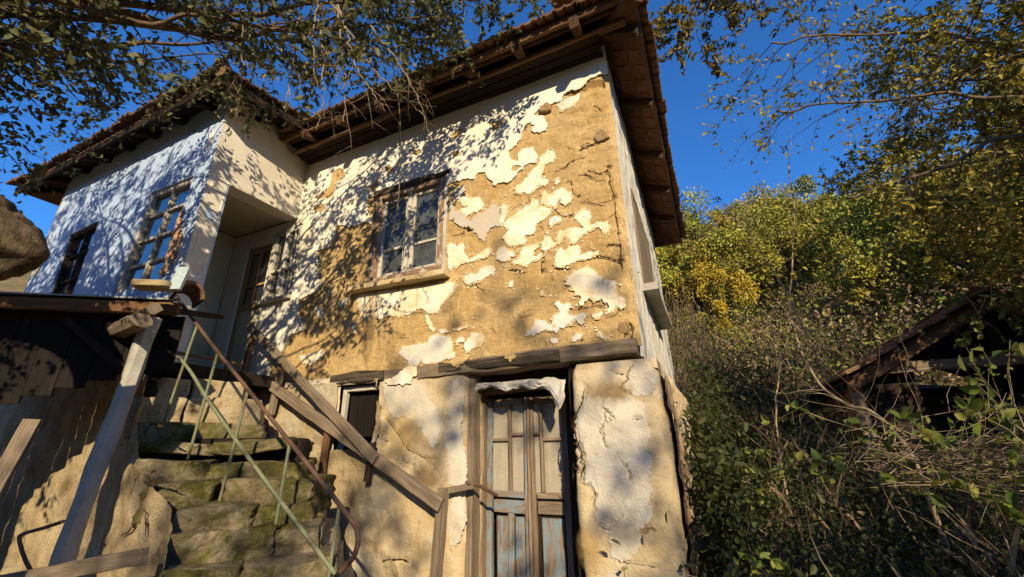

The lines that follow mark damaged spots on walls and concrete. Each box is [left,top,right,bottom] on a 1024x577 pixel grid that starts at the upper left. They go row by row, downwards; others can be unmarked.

spalling [270,51,642,548]
crack [509,138,623,281]
peeling [574,362,697,577]